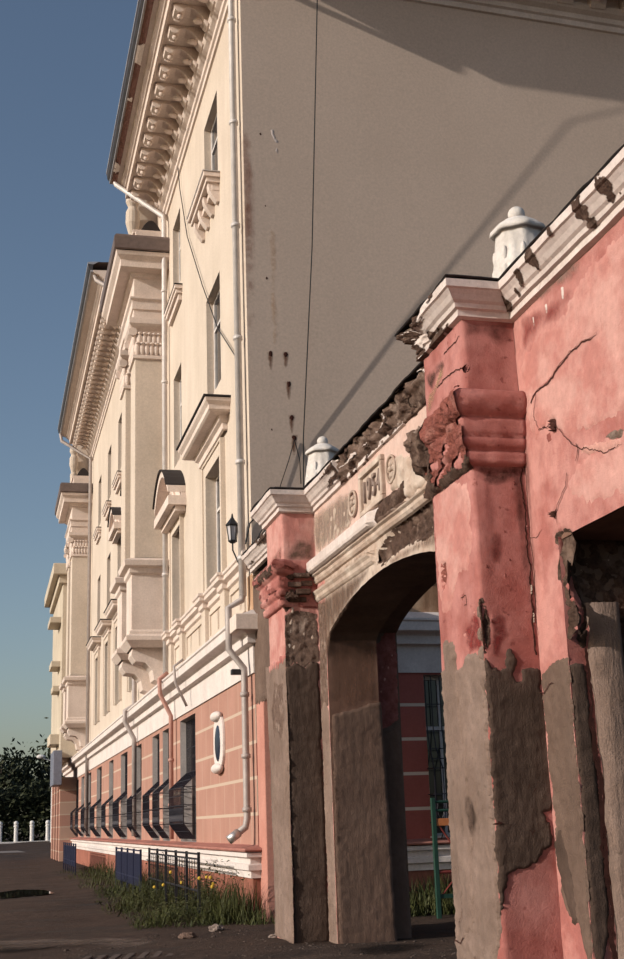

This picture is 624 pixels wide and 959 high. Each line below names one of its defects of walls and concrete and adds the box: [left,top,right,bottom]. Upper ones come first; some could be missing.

peeling [570,194,597,229]
peeling [594,172,621,203]
peeling [502,246,539,312]
crack [437,337,470,388]
flaking render [334,316,467,523]
crack [520,332,621,655]
spalling [374,500,434,567]
spalling [555,525,624,658]
peeling [269,569,338,944]